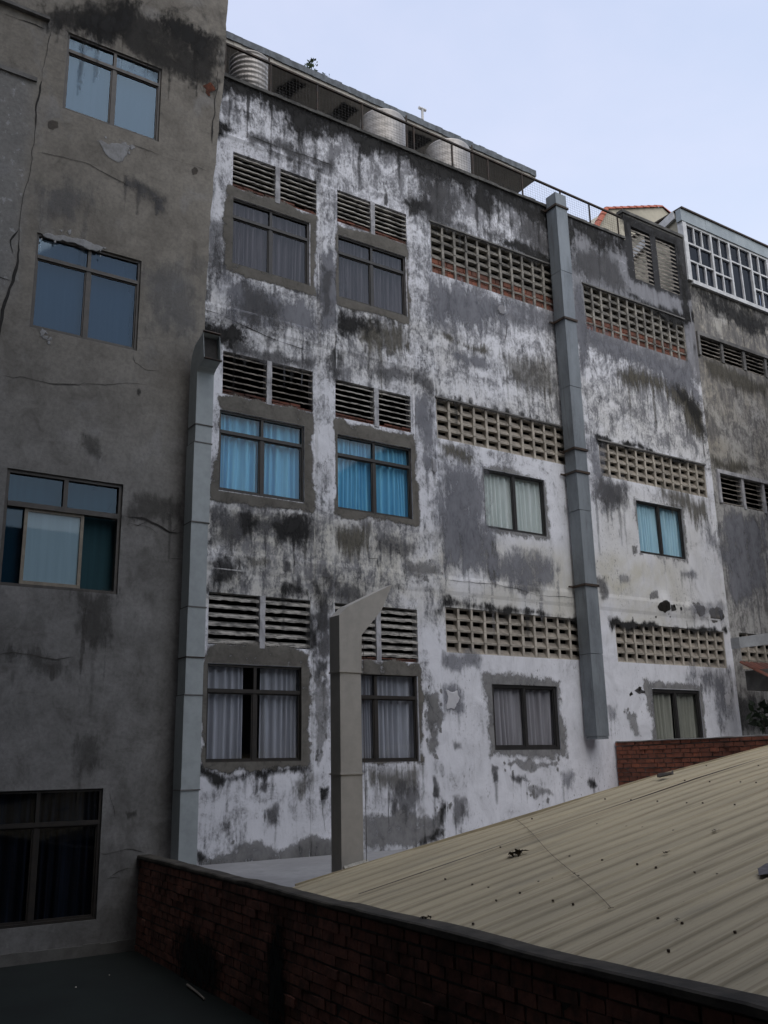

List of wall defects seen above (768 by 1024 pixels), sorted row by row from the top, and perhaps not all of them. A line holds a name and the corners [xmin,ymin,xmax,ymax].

water stain [47,0,550,265]
peeling [41,229,106,257]
water stain [205,224,555,590]
water stain [587,433,653,513]
crack [121,515,181,533]
water stain [208,508,363,679]
water stain [200,763,308,796]
water stain [265,805,279,824]
water stain [370,767,419,817]
water stain [420,777,466,846]